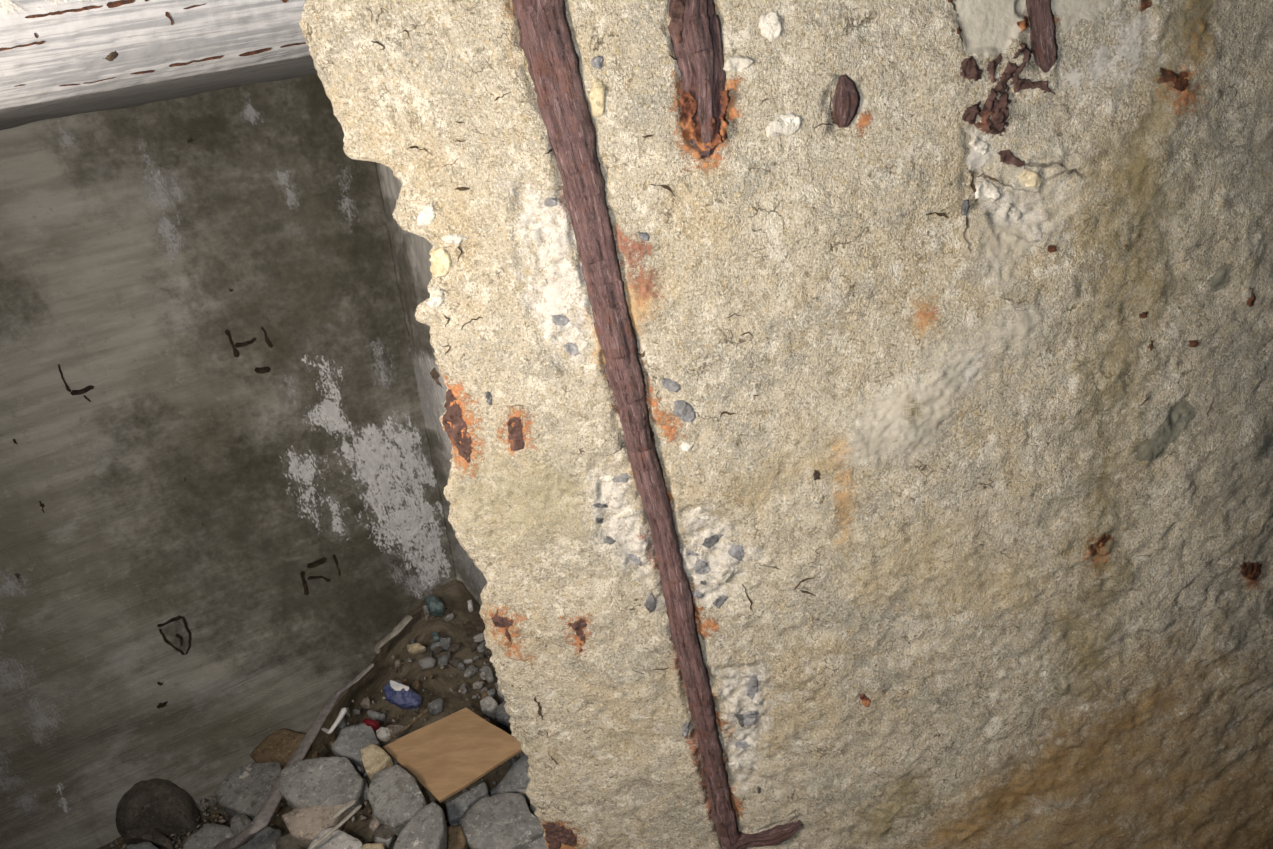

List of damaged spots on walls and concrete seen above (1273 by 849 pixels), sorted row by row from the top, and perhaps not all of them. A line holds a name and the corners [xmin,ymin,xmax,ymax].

rust [25,0,149,18]
spalling [832,74,859,128]
rust [960,13,1056,168]
spalling [956,0,1168,96]
spalling [961,129,1044,240]
leakage [111,75,487,634]
rust [441,375,536,478]
spalling [499,0,803,849]
spalling [438,633,497,695]
rust [559,612,593,657]
leakage [933,698,1273,849]
rust [540,817,586,849]